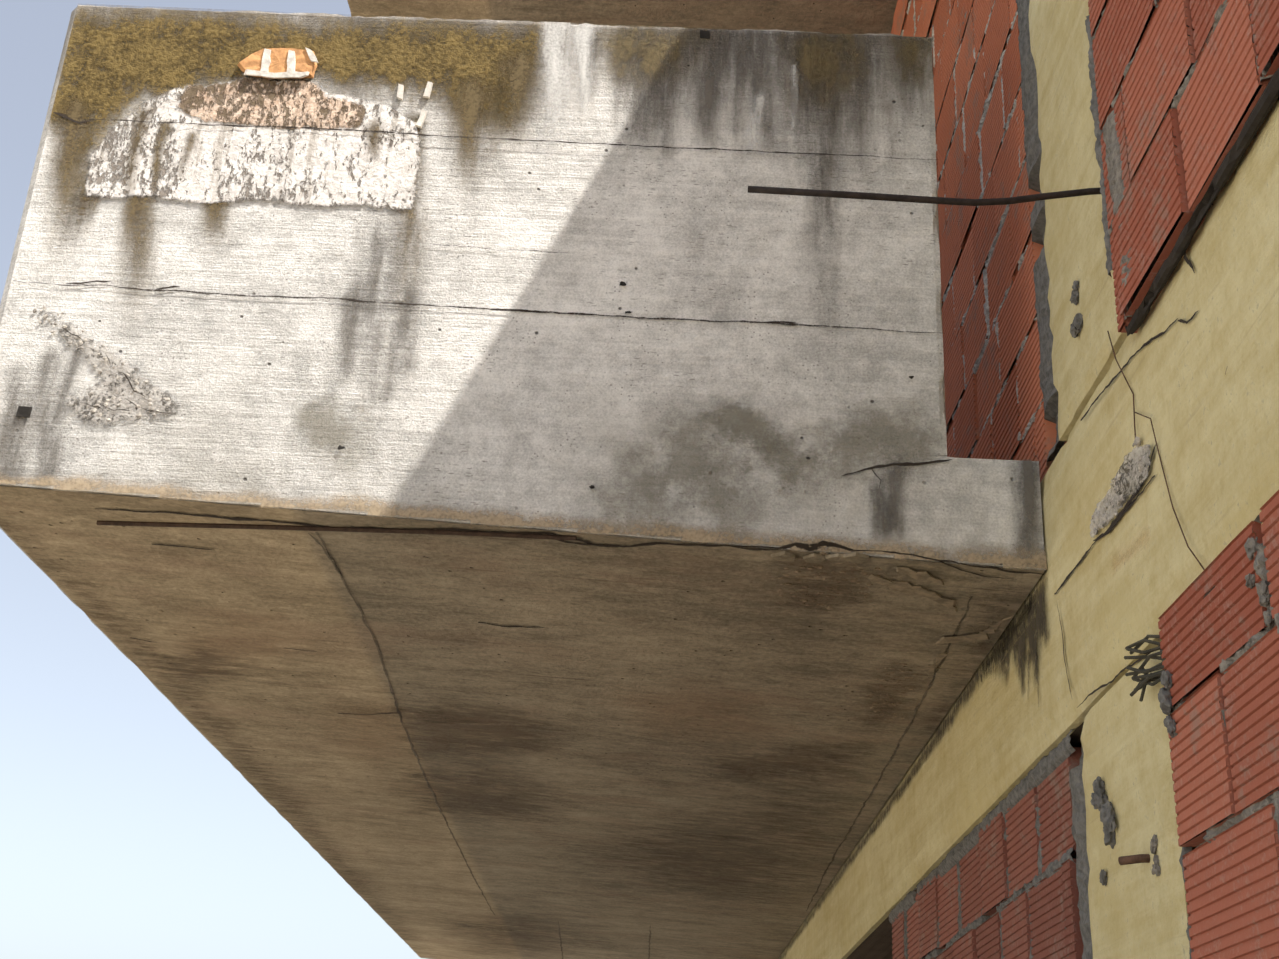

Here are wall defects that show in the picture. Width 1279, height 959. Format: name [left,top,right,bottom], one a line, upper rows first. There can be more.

spalling [85,47,433,210]
damp [453,22,596,167]
damp [617,25,932,217]
damp [344,230,383,365]
crack [13,280,935,333]
damp [628,425,750,515]
damp [828,417,927,534]
crack [842,459,952,492]
spalling [1090,436,1156,541]
crack [95,508,782,915]
crack [807,475,1160,910]